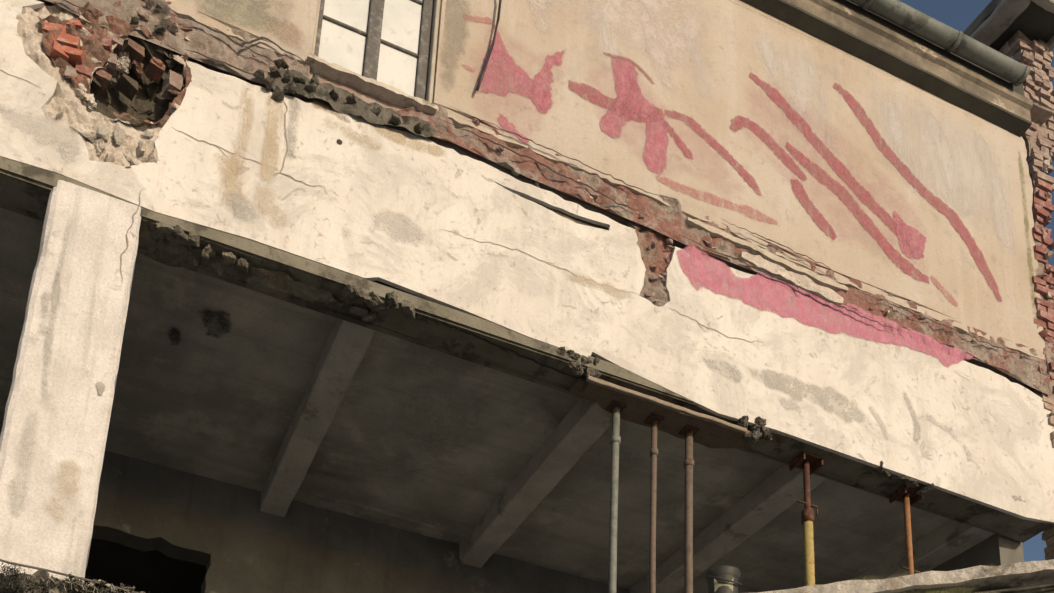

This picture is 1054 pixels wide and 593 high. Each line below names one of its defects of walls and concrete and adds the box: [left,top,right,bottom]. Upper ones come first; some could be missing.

spalling [16,0,192,168]
crack [175,100,323,187]
crack [439,106,680,217]
damp [43,272,60,383]
crack [120,191,141,281]
spalling [342,284,415,322]
spalling [525,198,608,230]
spalling [628,216,674,307]